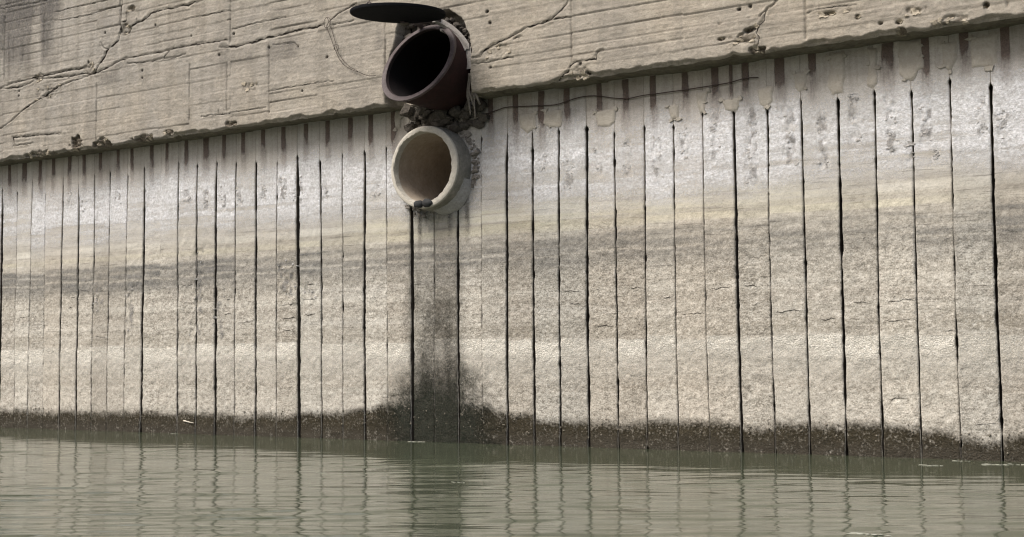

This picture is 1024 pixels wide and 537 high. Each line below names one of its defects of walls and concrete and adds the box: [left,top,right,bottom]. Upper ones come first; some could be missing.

crack [2,0,355,146]
crack [474,4,567,64]
damp [1,295,1024,444]